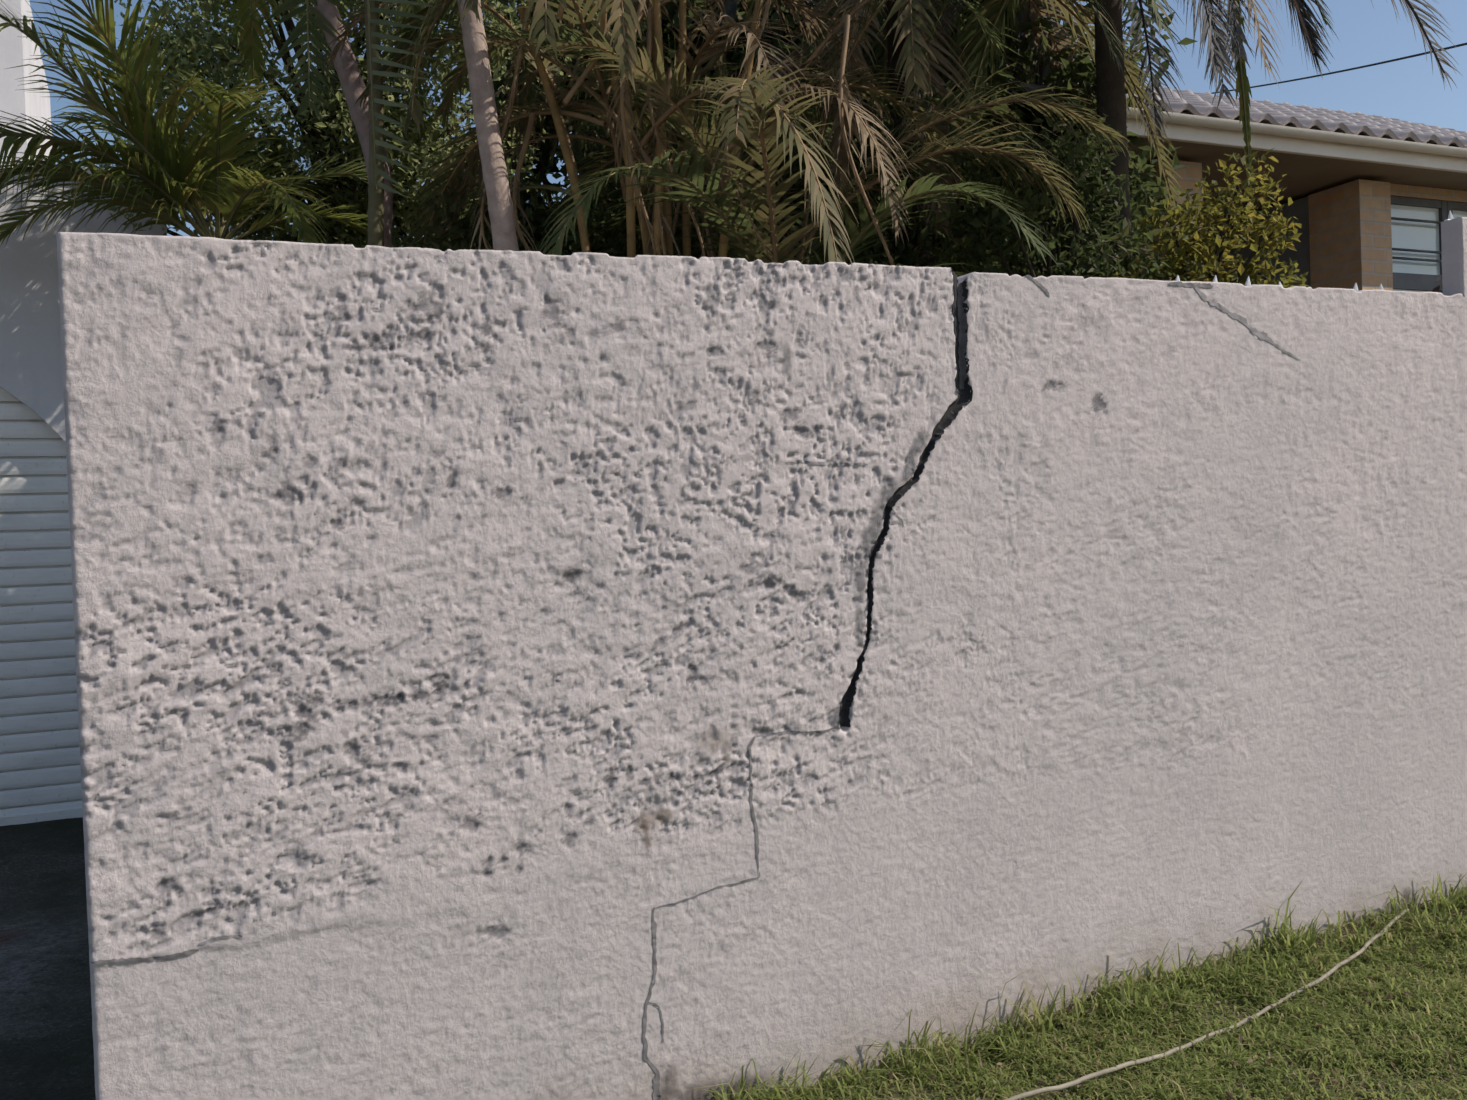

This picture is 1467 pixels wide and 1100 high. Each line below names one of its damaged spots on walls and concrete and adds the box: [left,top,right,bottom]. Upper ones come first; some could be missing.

crack [642,267,973,1100]
crack [1169,281,1300,360]